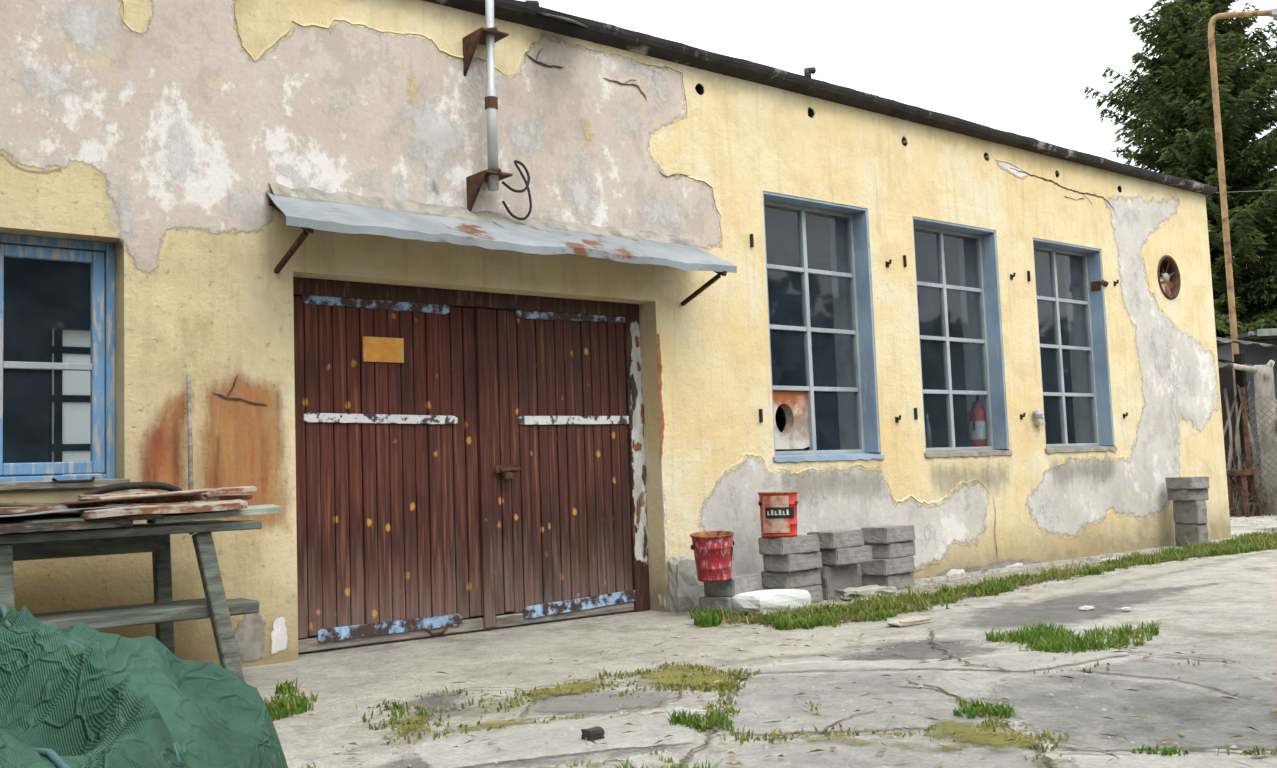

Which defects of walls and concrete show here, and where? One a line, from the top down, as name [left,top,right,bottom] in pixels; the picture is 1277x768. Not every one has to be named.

peeling [0,0,724,273]
crack [1010,168,1116,214]
crack [212,375,267,406]
peeling [1024,192,1220,541]
rust [143,395,187,504]
rust [204,377,280,525]
peeling [697,452,1038,590]
crack [415,668,683,717]
crack [676,670,752,768]
crack [780,709,940,736]
crack [927,627,1017,672]
crack [899,677,1277,768]